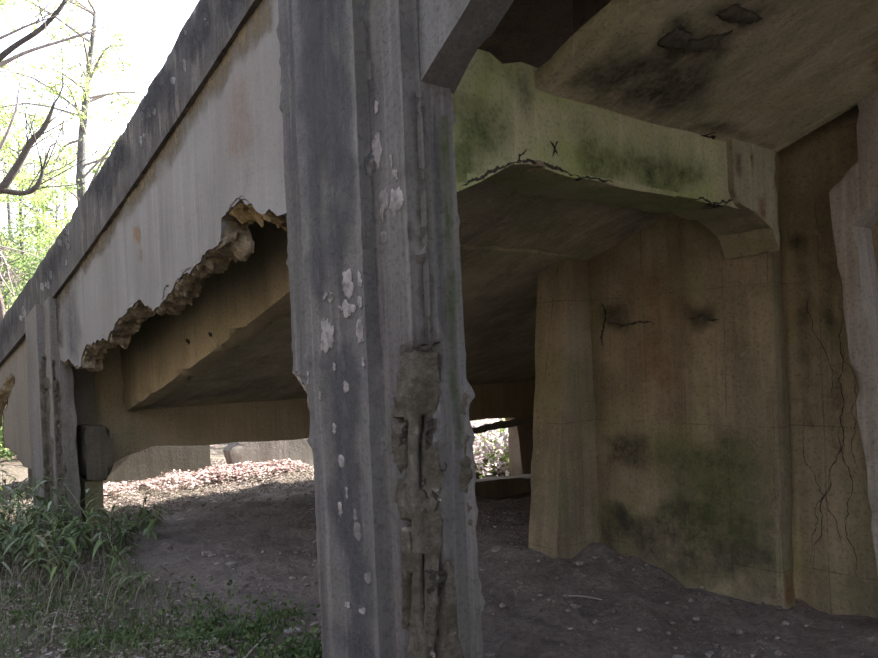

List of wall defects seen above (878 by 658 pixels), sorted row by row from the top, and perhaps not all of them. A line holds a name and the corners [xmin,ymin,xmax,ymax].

peeling [657,3,763,56]
water stain [587,58,706,109]
peeling [371,132,404,221]
crack [461,141,612,186]
crack [684,197,732,210]
spalling [39,195,287,524]
peeling [320,319,335,354]
peeling [323,268,363,344]
crack [600,304,655,346]
spalling [0,373,25,466]
crack [802,288,858,576]
spalling [391,340,465,658]